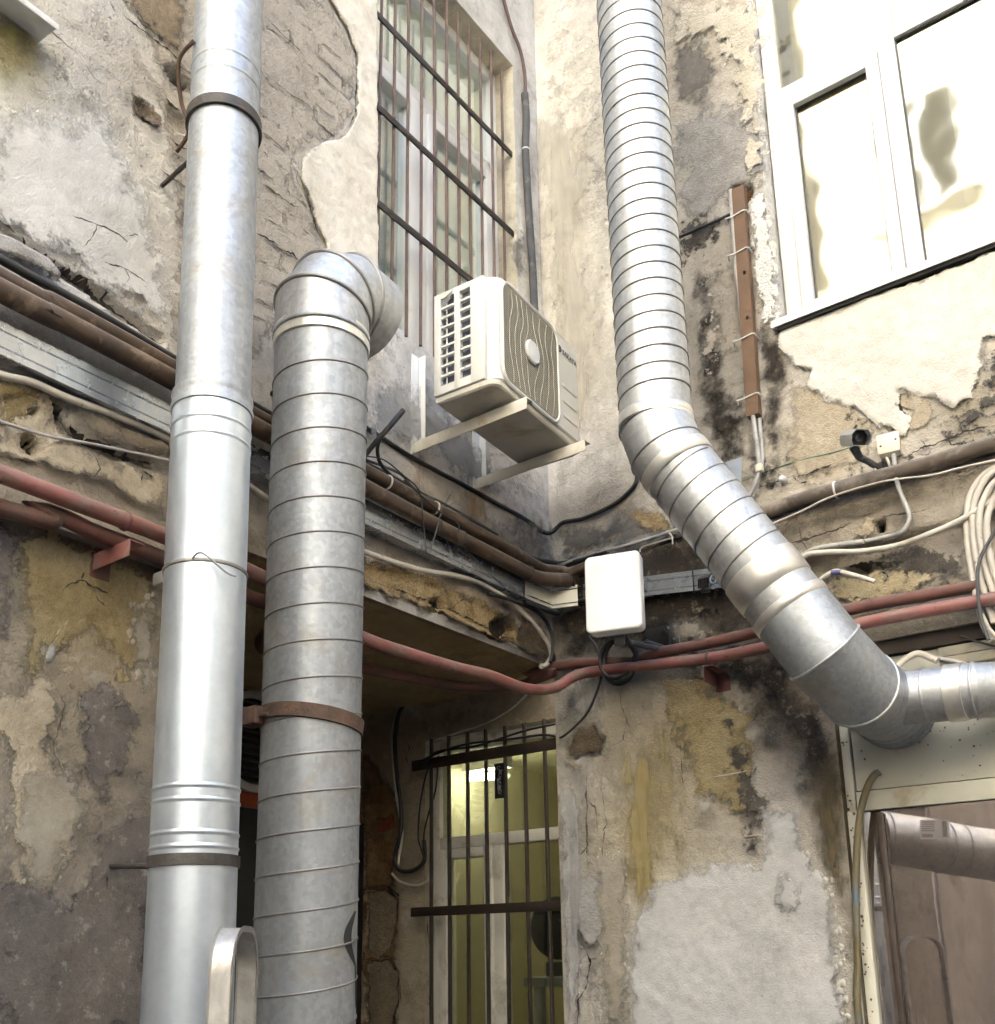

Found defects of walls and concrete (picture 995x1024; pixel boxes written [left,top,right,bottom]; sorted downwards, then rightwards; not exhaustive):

damp [675,35,718,105]
flaking render [124,0,195,341]
flaking render [252,0,356,354]
peeling [665,0,783,323]
crack [0,215,168,344]
spalling [0,379,165,506]
damp [694,274,746,462]
damp [758,328,786,448]
peeling [0,531,159,894]
crack [580,765,607,876]
damp [715,708,769,853]
crack [577,936,608,1024]